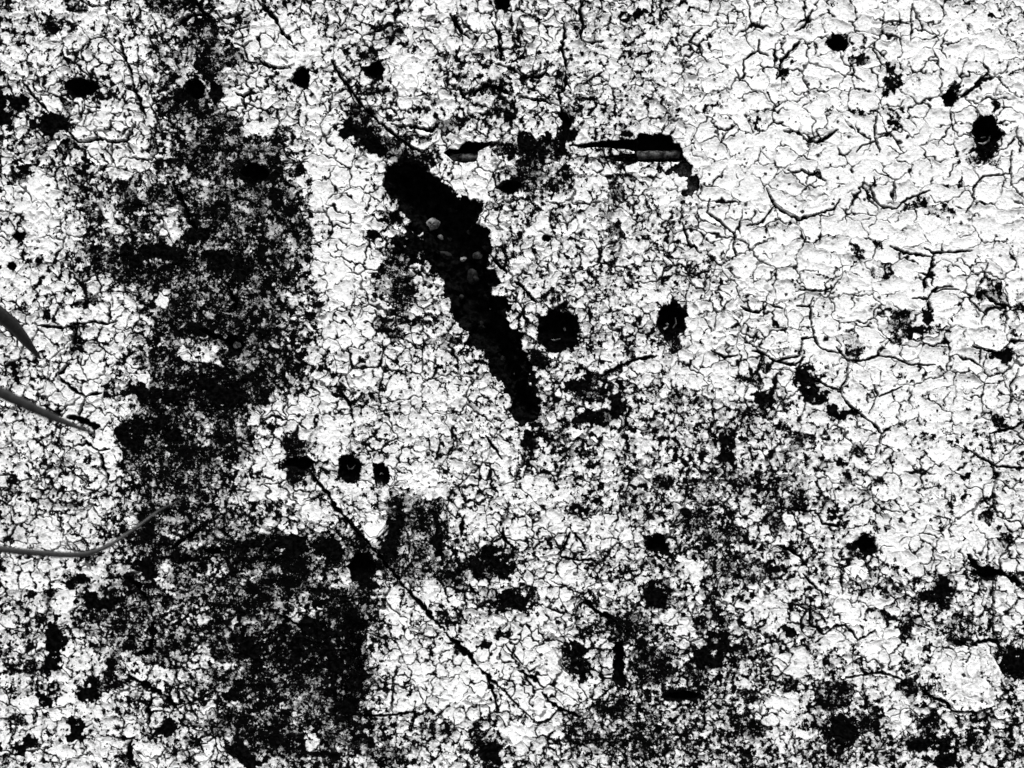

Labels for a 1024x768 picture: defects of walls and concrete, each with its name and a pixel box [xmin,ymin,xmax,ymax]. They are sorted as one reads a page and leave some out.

crack [459,4,602,144]
spalling [574,134,698,197]
crack [44,308,117,484]
damp [113,369,249,456]
damp [118,224,253,286]
spalling [384,164,541,426]
spalling [537,311,579,352]
spalling [657,303,686,339]
crack [711,289,933,454]
crack [311,473,577,722]
damp [230,606,373,730]
damp [222,725,268,768]